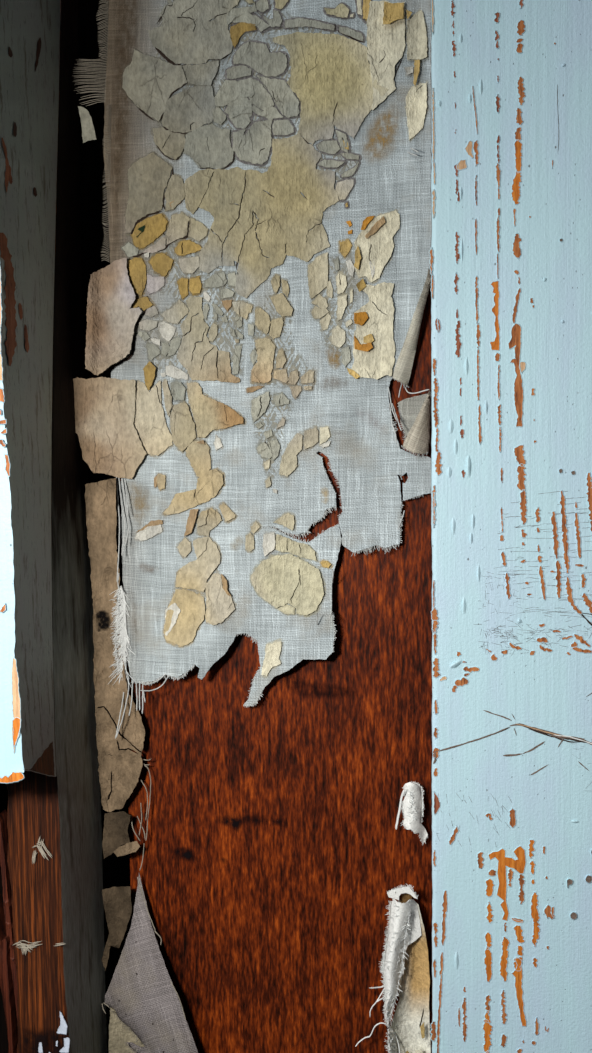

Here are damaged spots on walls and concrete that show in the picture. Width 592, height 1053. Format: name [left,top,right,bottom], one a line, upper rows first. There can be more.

crack [334,26,402,79]
crack [125,0,274,273]
peeling [0,233,29,477]
crack [101,296,148,376]
crack [183,313,218,376]
peeling [73,0,436,646]
peeling [474,76,592,615]
peeling [11,658,22,753]
peeling [431,580,480,693]
peeling [486,623,592,661]
peeling [430,890,448,1053]
peeling [477,839,555,1053]